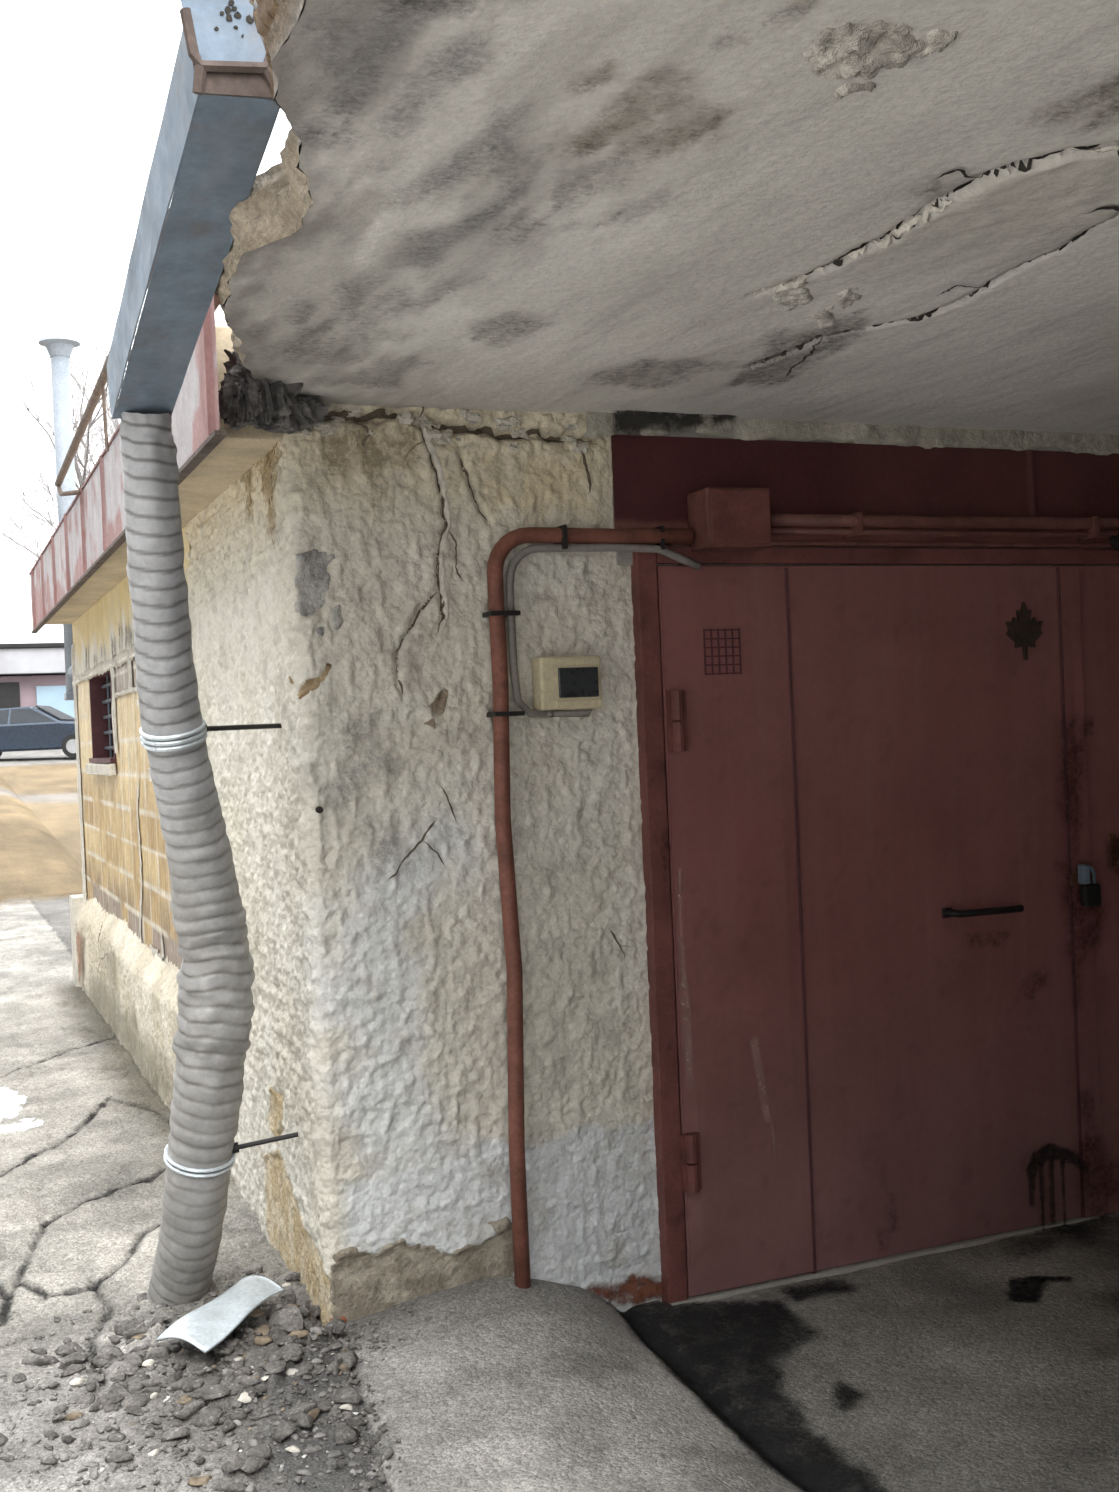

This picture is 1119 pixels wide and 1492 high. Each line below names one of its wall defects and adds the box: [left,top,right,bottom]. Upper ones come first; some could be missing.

spalling [249,0,279,70]
spalling [803,19,958,99]
crack [753,144,1119,296]
leakage [730,312,860,385]
crack [754,281,990,378]
leakage [615,410,736,435]
crack [303,403,592,694]
peeling [294,549,344,637]